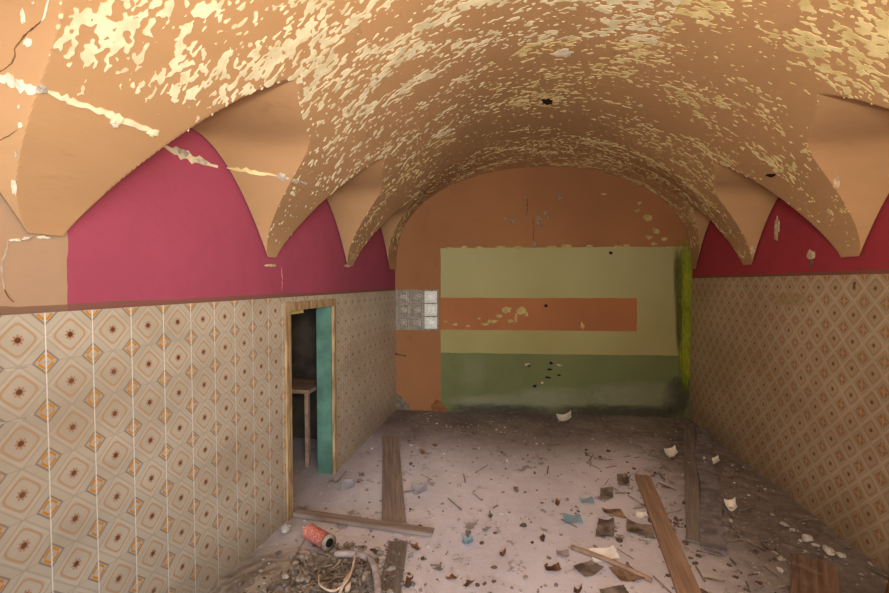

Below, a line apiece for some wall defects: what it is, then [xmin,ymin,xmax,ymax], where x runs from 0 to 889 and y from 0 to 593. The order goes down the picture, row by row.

crack [0,21,307,196]
peeling [42,0,889,267]
crack [1,242,14,302]
peeling [443,307,528,327]